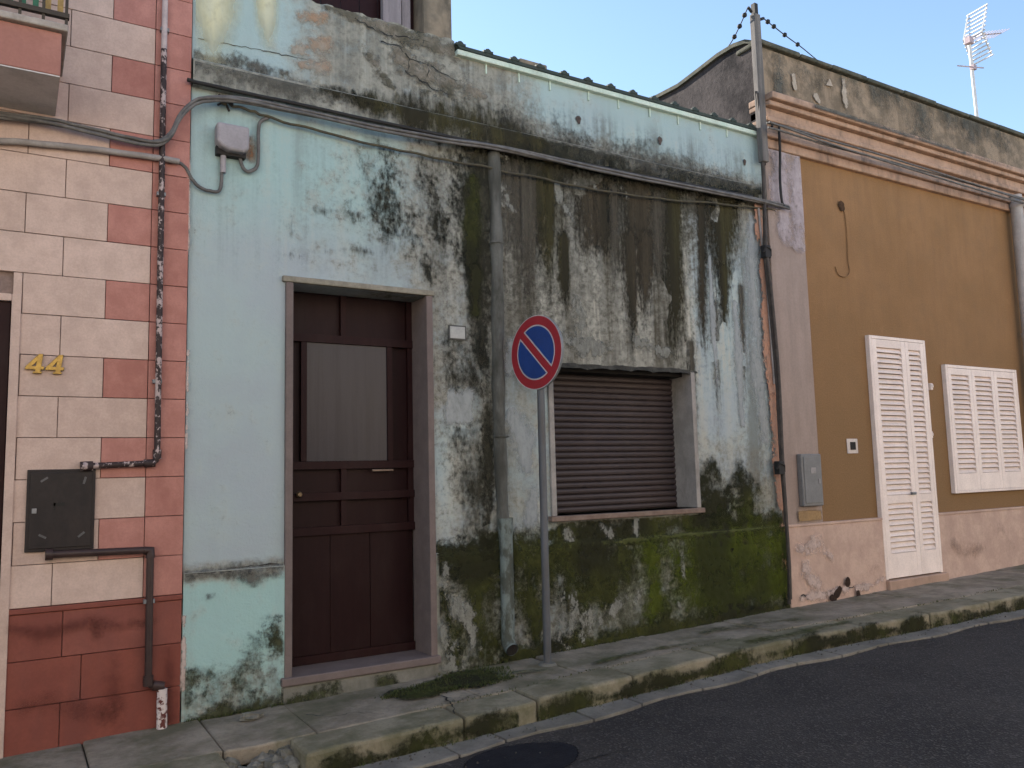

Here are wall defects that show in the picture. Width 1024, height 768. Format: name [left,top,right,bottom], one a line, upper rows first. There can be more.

spalling [291,5,488,100]
crack [355,17,461,95]
leakage [369,140,418,247]
leakage [418,134,762,549]
spalling [800,577,886,601]
leakage [185,616,284,722]